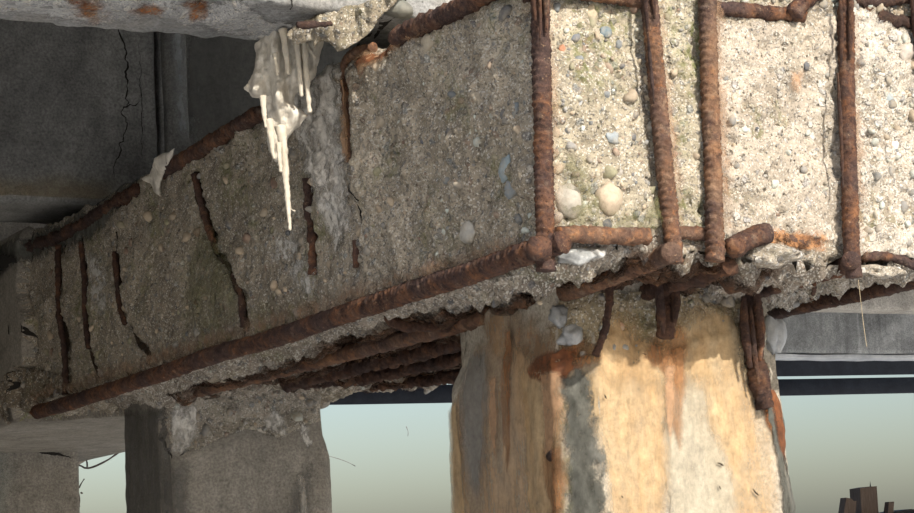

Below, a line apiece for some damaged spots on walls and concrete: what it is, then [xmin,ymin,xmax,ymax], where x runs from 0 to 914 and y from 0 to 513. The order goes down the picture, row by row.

crack [113,29,143,182]
spalling [0,0,293,40]
corrosion [531,0,551,45]
corrosion [836,0,859,187]
spalling [90,0,914,452]
spalling [0,302,78,425]
corrosion [168,292,542,406]
corrosion [527,343,598,513]
damp [450,312,770,513]
corrosion [561,245,778,437]
corrosion [765,389,786,466]
damp [768,407,796,513]